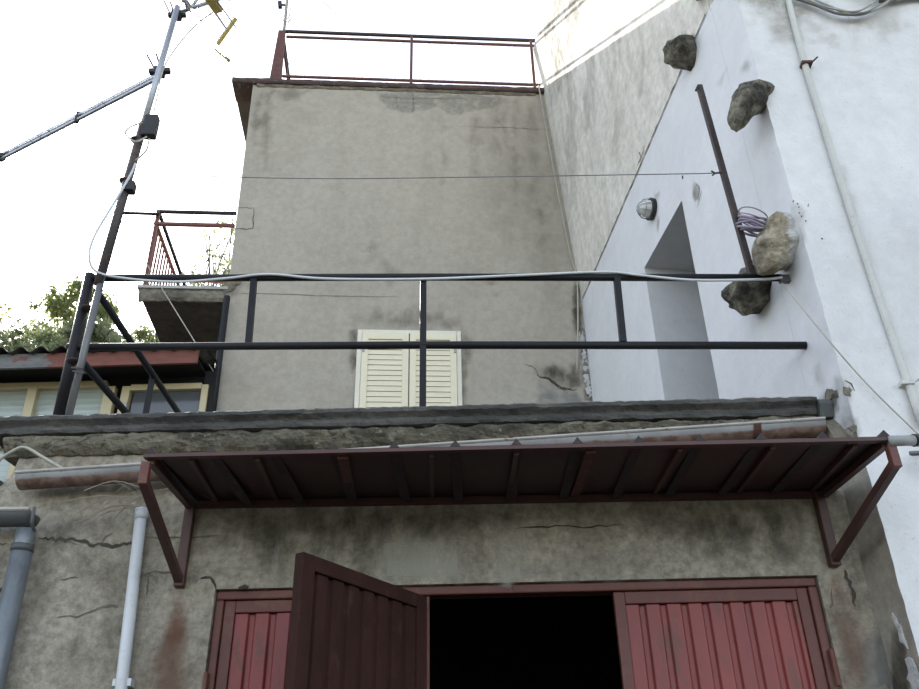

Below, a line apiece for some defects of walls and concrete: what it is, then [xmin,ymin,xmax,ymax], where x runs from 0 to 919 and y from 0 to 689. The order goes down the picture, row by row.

crack [525,364,576,391]
crack [39,529,218,549]
crack [515,522,618,530]
crack [829,570,856,609]